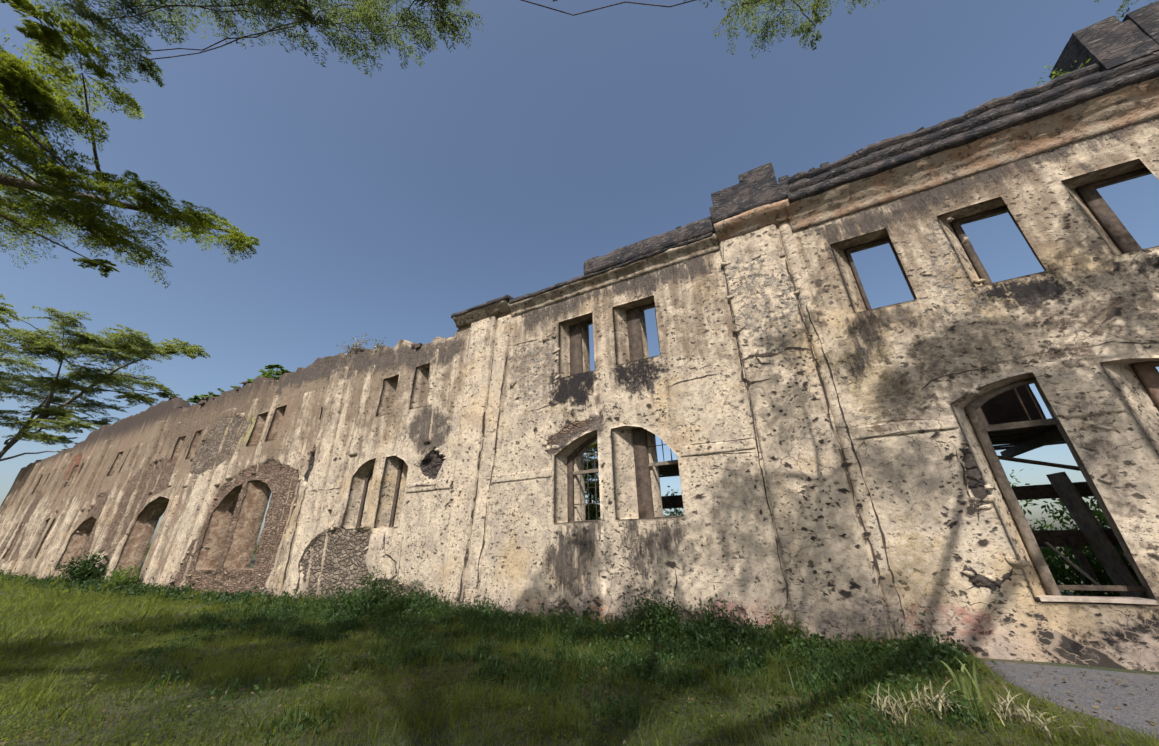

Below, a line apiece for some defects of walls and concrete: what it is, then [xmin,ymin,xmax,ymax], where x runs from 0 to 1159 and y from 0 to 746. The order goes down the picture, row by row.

water stain [805,117,1159,262]
flaking render [75,414,253,565]
flaking render [166,447,461,601]
water stain [165,338,465,446]
water stain [404,405,451,454]
water stain [545,514,604,599]
water stain [545,359,606,459]
water stain [614,353,669,398]
water stain [620,517,683,593]
crack [667,240,979,635]
water stain [847,251,1159,428]
crack [922,341,1159,390]